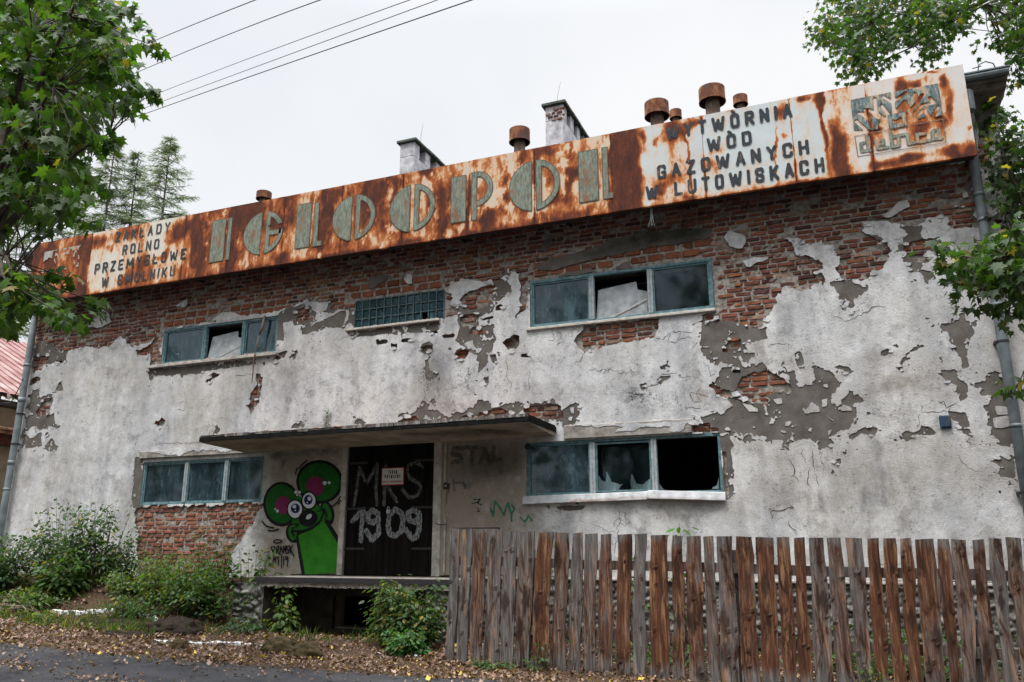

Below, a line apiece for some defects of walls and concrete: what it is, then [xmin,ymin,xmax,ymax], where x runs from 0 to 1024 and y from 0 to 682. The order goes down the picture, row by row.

flaking render [18,129,1002,500]
flaking render [925,303,1018,494]